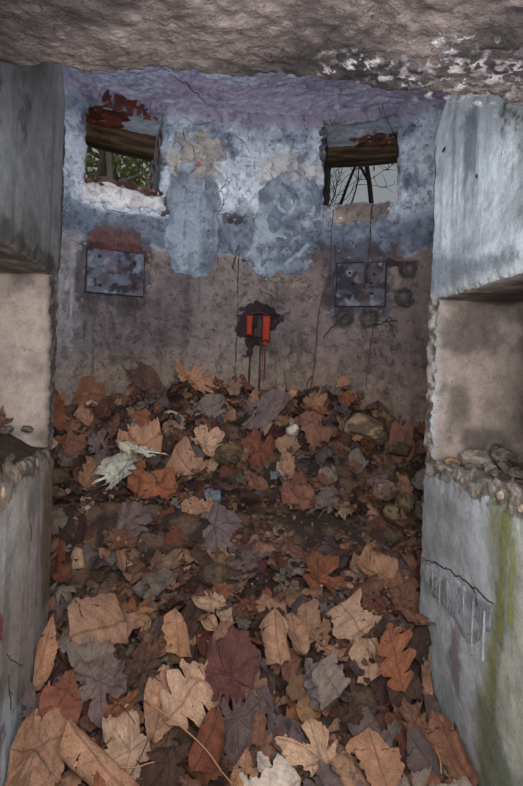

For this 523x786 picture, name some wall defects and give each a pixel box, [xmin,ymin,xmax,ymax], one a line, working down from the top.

corrosion [86,89,158,130]
peeling [173,130,227,167]
corrosion [349,131,398,148]
peeling [82,176,170,217]
spalling [222,212,246,225]
peeling [335,201,390,224]
peeling [73,234,153,309]
peeling [319,239,394,317]
spalling [0,126,66,511]
crack [421,557,494,607]
water stain [495,514,515,644]